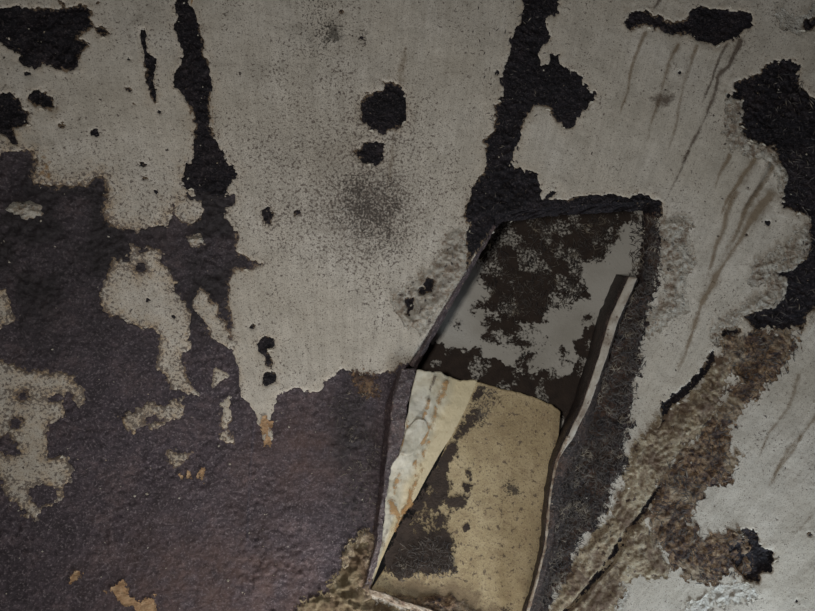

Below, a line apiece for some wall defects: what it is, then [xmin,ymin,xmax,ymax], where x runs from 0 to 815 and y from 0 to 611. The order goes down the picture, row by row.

peeling [720,93,788,200]
peeling [390,226,470,338]
peeling [709,212,811,346]
peeling [348,365,382,401]
peeling [400,418,429,456]